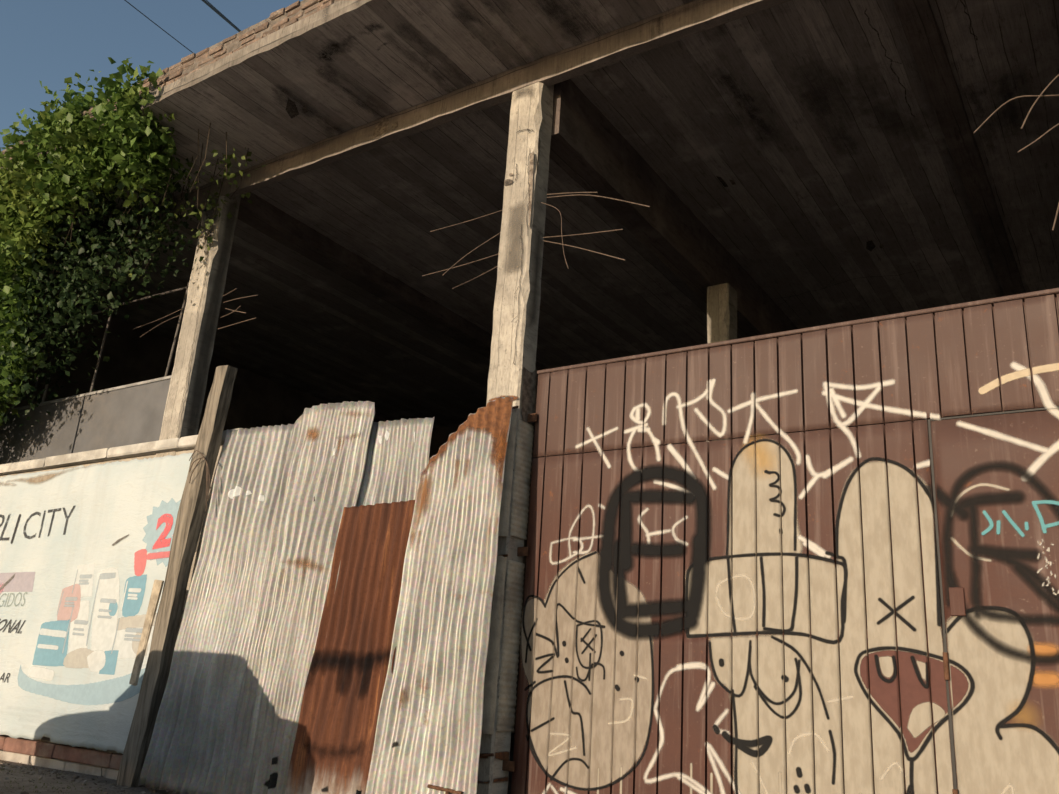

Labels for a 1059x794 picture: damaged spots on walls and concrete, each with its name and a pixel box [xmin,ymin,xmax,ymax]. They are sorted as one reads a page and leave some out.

rust [418,396,518,521]